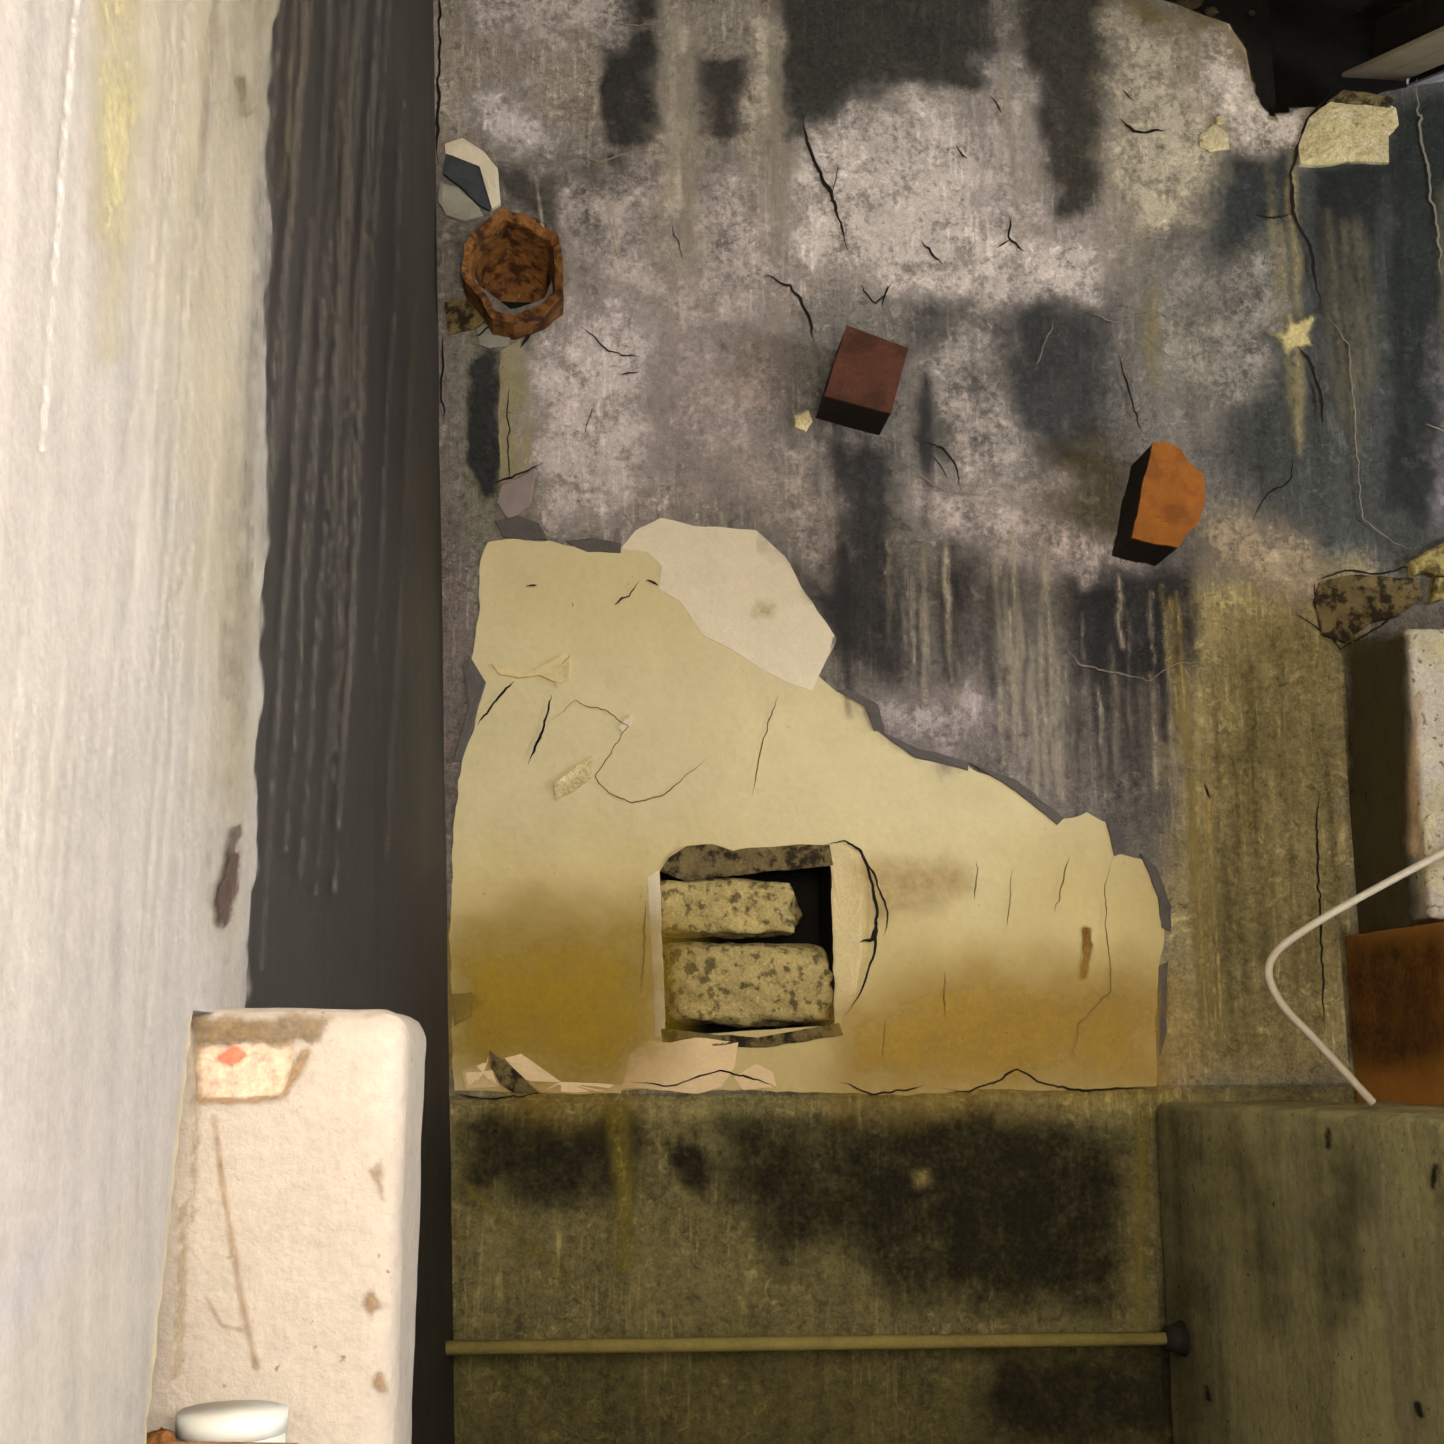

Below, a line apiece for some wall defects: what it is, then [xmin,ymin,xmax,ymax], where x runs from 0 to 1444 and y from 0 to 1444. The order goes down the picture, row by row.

crack [802,114,849,252]
spalling [1297,90,1399,168]
crack [1252,91,1421,654]
leakage [1319,101,1444,513]
leakage [460,0,1309,1050]
leakage [1198,512,1334,605]
crack [528,695,704,803]
flaking render [445,297,1171,1096]
crack [827,840,889,1015]
crack [841,857,1156,1095]
leakage [466,1104,646,1272]
leakage [738,1109,1122,1307]